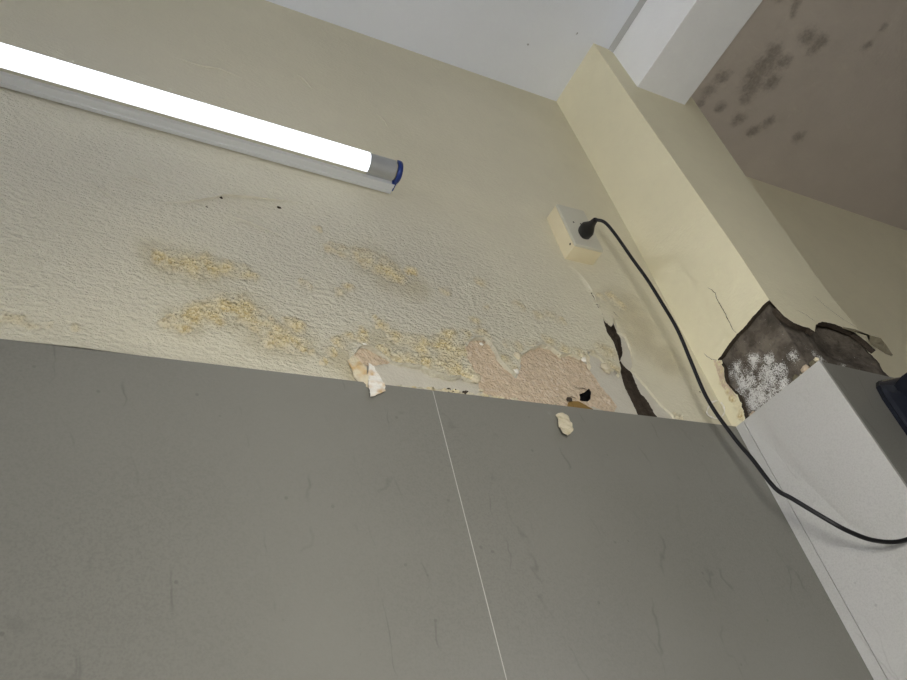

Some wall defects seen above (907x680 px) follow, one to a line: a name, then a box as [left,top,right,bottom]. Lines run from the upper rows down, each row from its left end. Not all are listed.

peeling [319,299,685,435]
spalling [706,300,893,419]